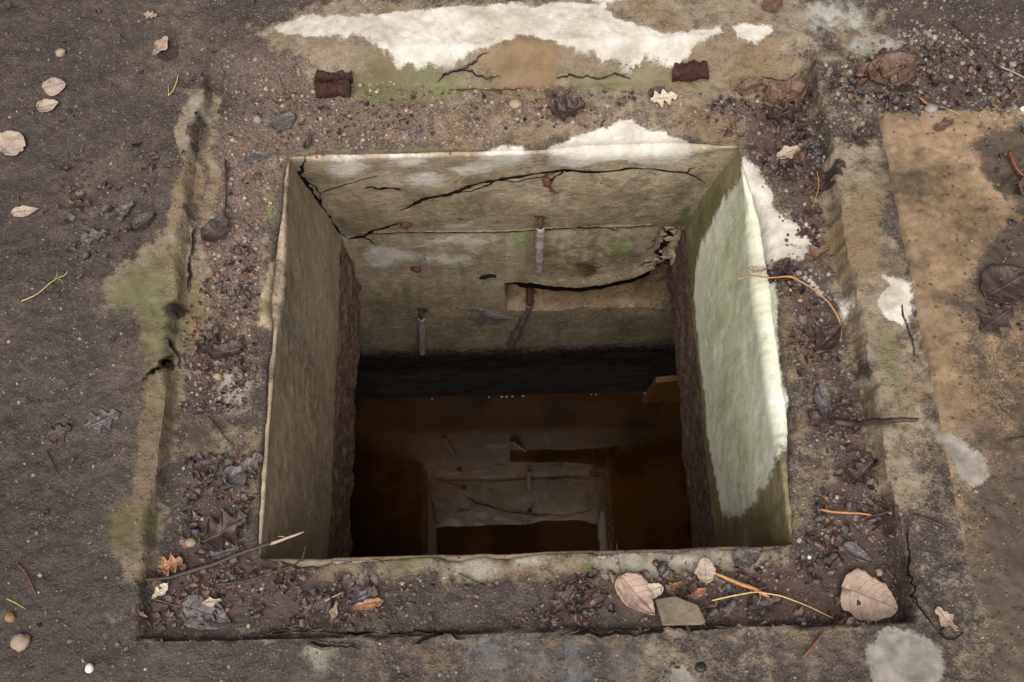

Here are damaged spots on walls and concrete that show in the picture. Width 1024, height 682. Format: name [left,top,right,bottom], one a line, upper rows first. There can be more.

crack [437,52,523,92]
crack [556,72,631,80]
crack [297,156,705,292]
spalling [504,223,683,311]
crack [904,522,936,631]